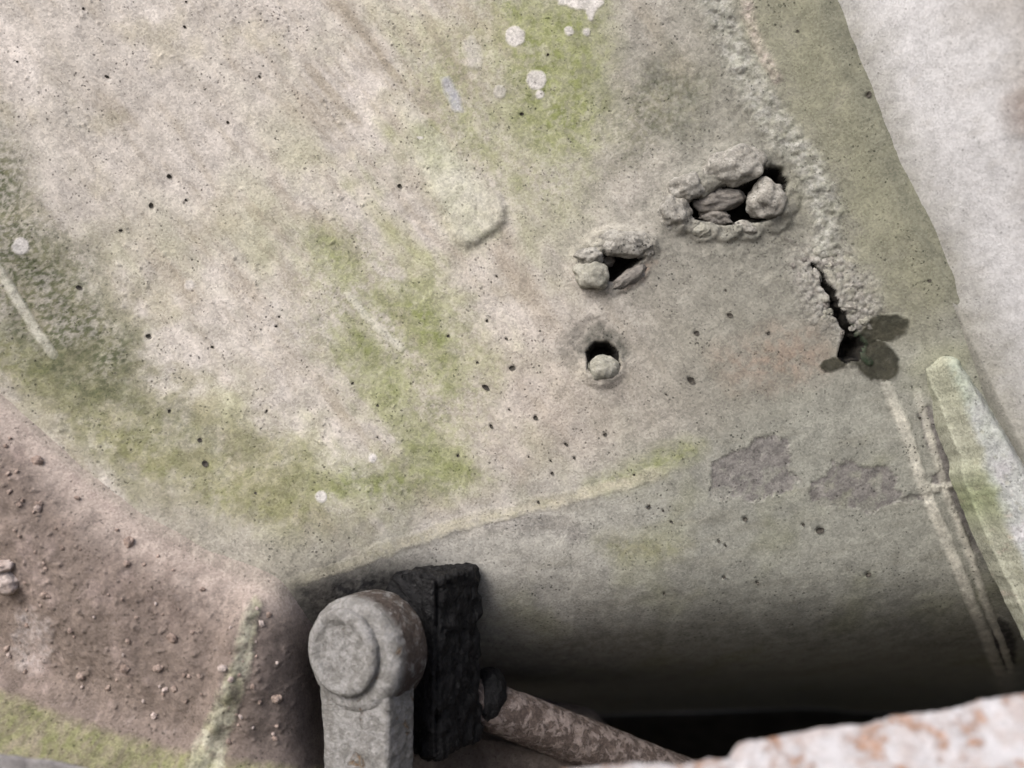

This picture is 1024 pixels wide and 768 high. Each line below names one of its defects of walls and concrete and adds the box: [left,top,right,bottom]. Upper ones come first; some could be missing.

spalling [657,143,787,238]
water stain [0,84,268,466]
spalling [572,229,654,290]
crack [781,234,854,344]
spalling [579,315,639,380]
water stain [819,313,912,384]